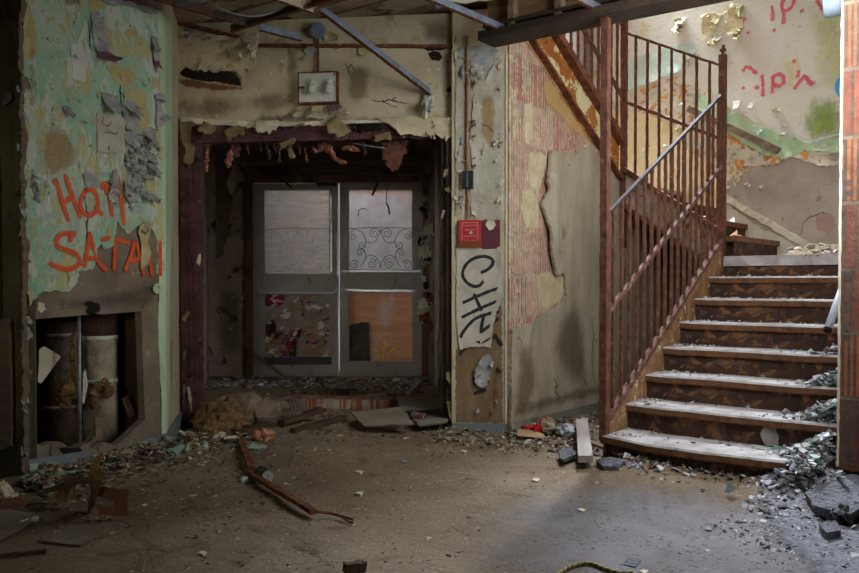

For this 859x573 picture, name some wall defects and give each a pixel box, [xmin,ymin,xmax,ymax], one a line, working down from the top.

peeling [2,0,504,476]
flaking render [446,3,840,432]
water stain [807,103,840,136]